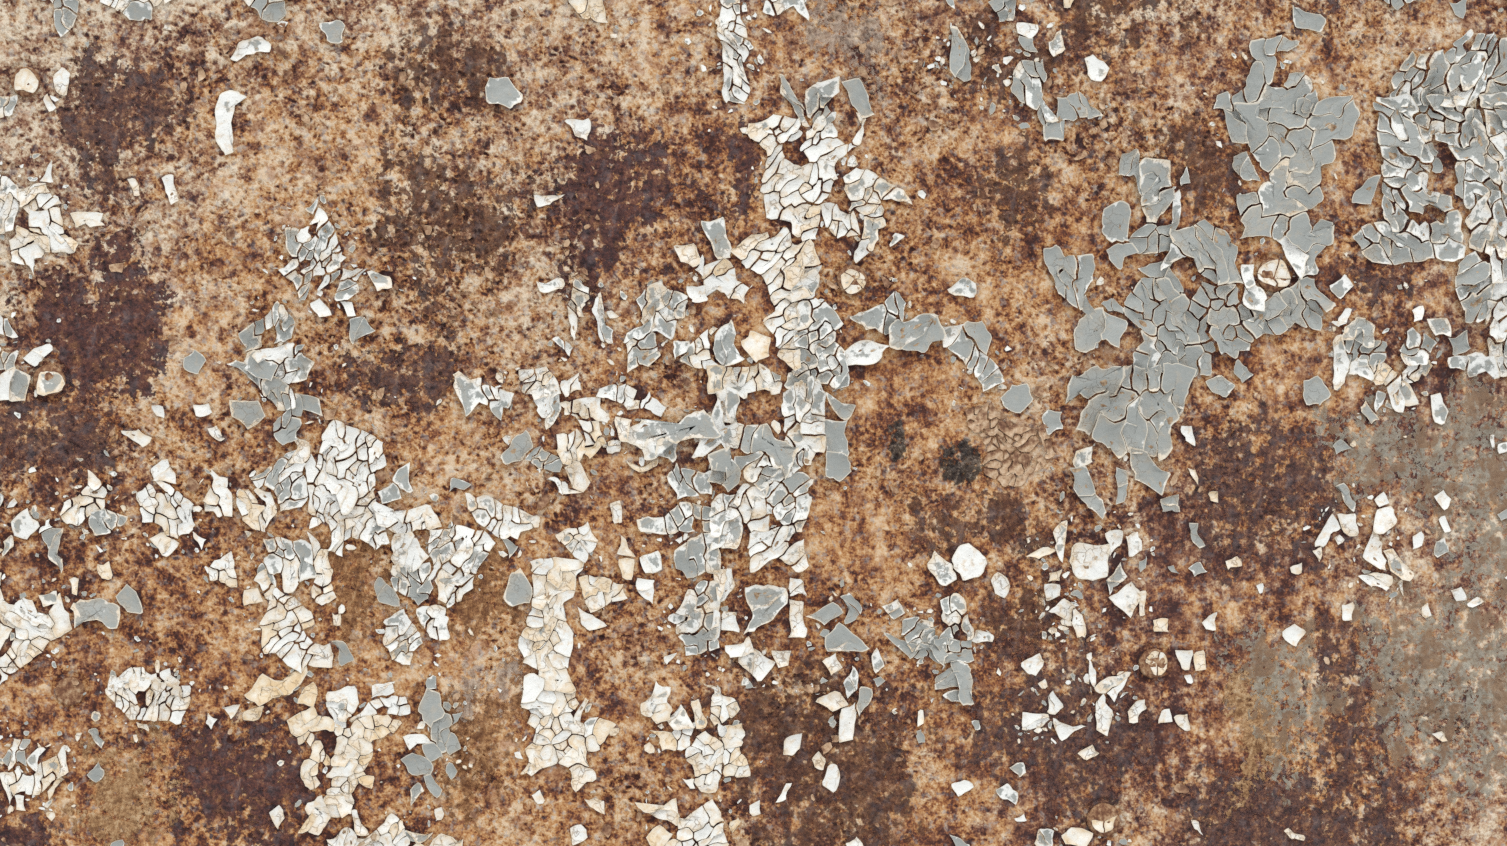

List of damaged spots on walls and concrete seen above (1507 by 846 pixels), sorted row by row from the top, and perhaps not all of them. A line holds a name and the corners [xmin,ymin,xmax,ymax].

corrosion [0,36,198,516]
peeling [230,0,287,61]
peeling [0,74,1033,846]
corrosion [334,9,770,425]
peeling [715,0,754,104]
peeling [988,0,1109,141]
corrosion [959,0,1210,108]
peeling [1021,0,1507,817]
corrosion [0,690,322,846]
corrosion [403,536,554,837]
peeling [996,762,1093,846]
corrosion [692,390,1495,846]